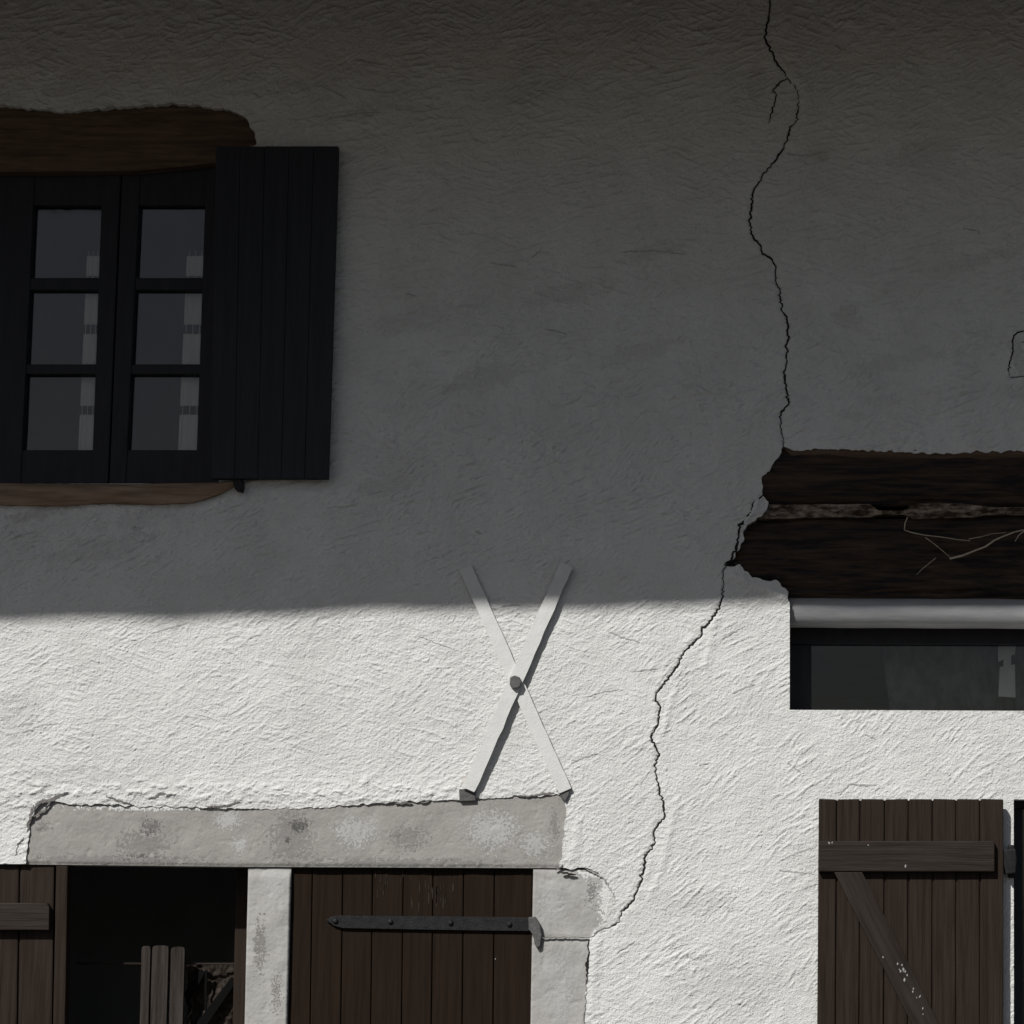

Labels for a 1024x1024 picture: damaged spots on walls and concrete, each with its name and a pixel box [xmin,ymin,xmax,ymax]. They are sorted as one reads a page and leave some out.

crack [748,0,800,449]
crack [542,494,763,1024]
crack [15,792,68,855]
crack [106,792,176,805]
crack [207,800,240,808]